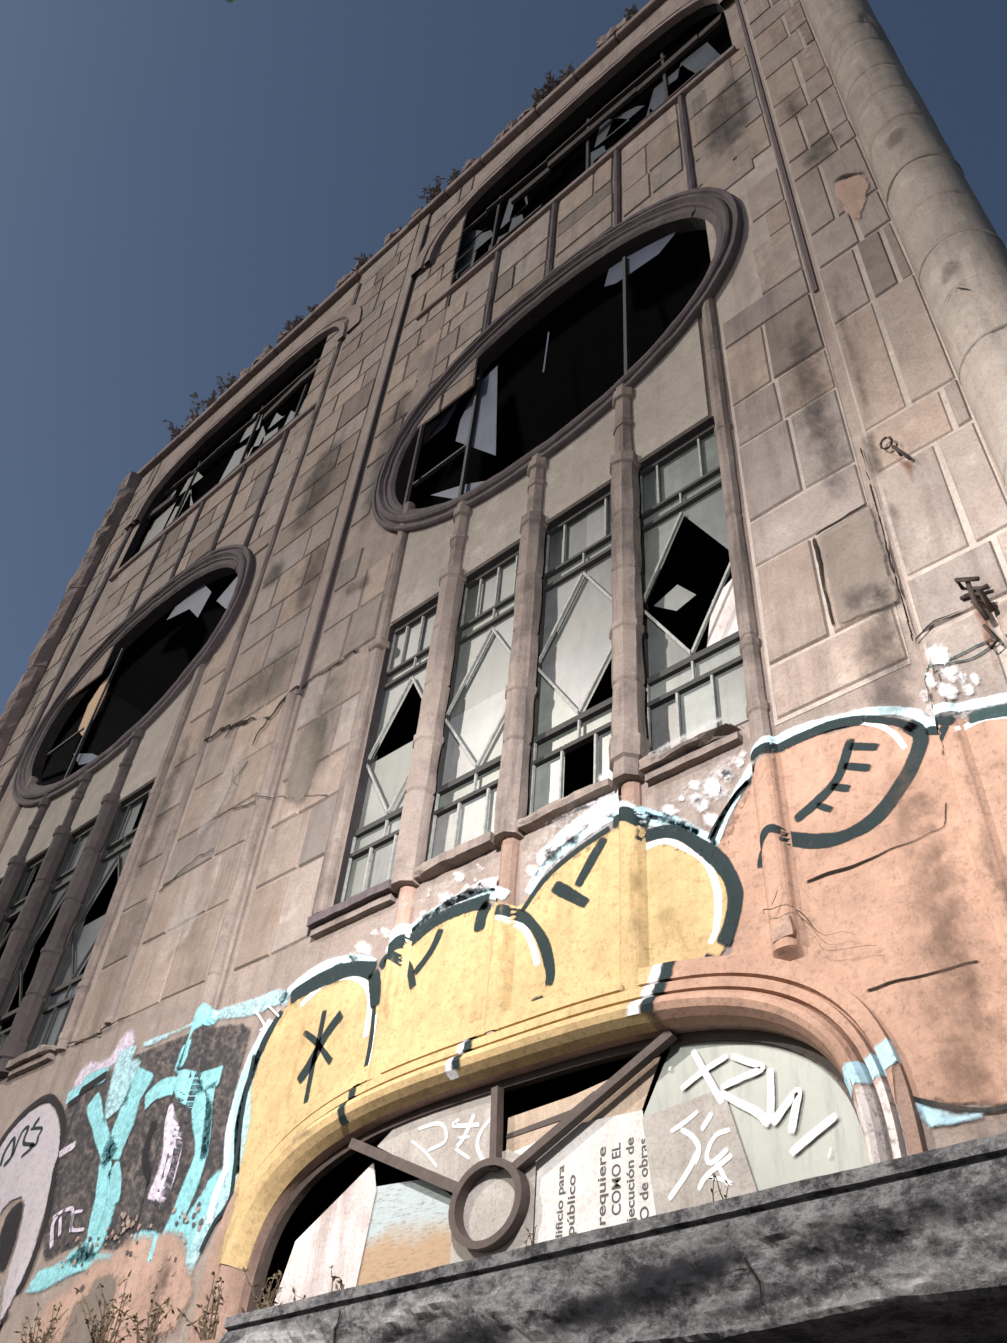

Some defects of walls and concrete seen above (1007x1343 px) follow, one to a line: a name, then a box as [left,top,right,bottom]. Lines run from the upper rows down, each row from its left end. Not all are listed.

spalling [834,172,869,218]
crack [158,649,359,893]